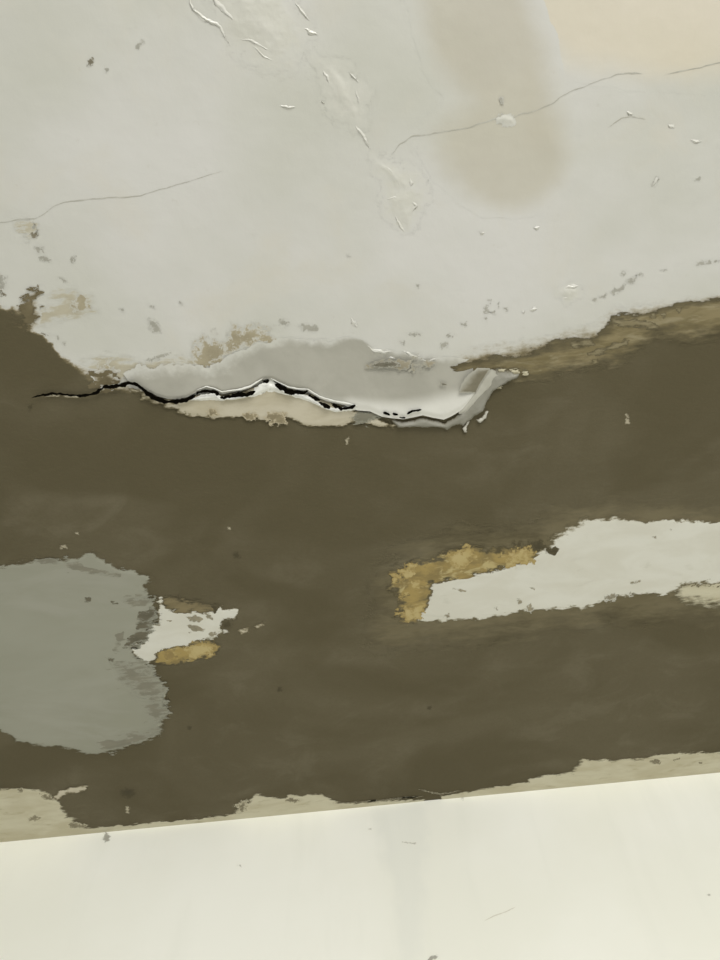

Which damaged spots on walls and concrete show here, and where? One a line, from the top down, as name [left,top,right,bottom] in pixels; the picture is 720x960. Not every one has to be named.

crack [393,72,641,153]
water stain [404,0,720,219]
crack [0,171,221,223]
spalling [13,217,52,263]
crack [32,379,356,411]
crack [383,409,421,419]
spalling [0,270,720,828]